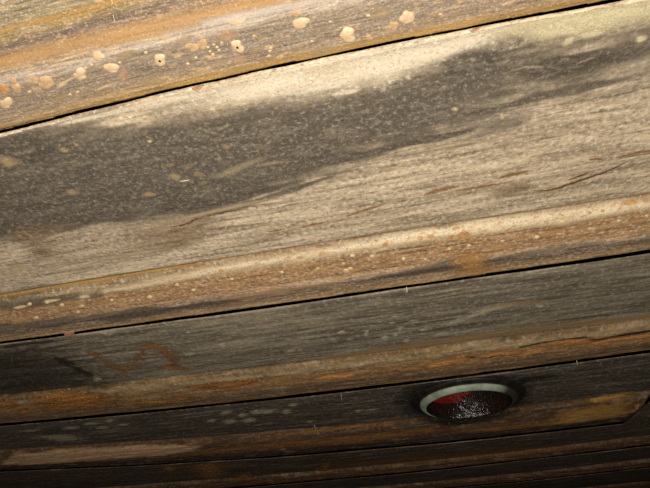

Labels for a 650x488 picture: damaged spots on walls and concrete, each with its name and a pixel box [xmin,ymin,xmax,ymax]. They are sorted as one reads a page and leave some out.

damp [138,0,326,41]
damp [0,22,616,240]
crack [534,150,650,192]